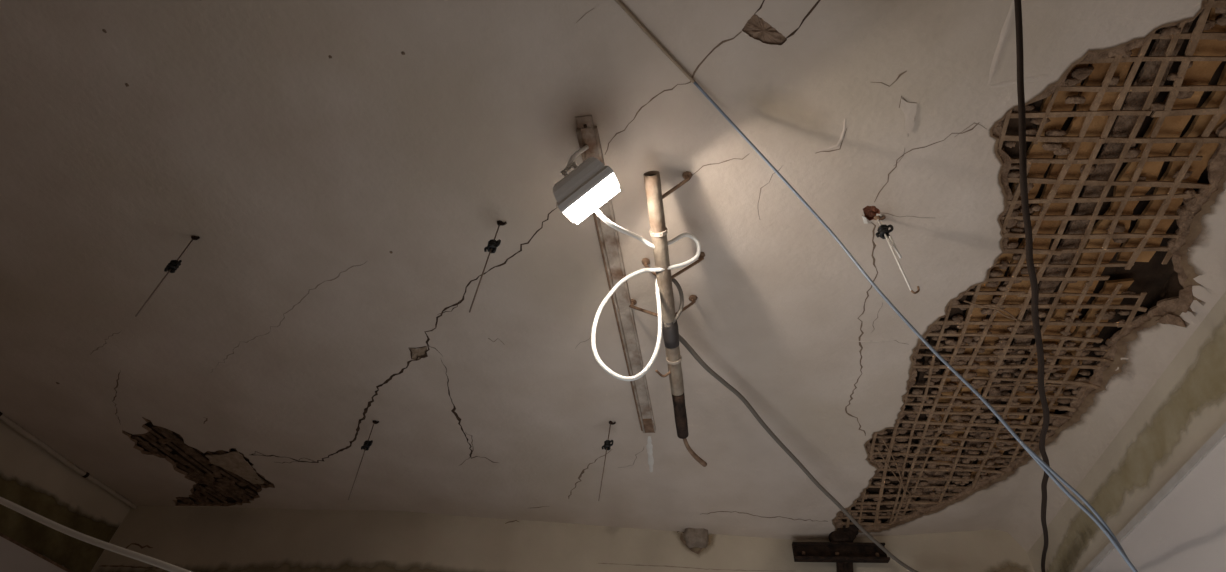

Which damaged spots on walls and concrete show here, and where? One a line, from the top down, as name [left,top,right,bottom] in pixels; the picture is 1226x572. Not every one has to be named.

crack [605,0,765,154]
spalling [742,14,787,45]
crack [785,0,821,39]
spalling [122,417,275,506]
crack [251,202,558,465]
crack [845,122,986,436]
spalling [832,0,1226,533]
leakage [1048,319,1226,572]